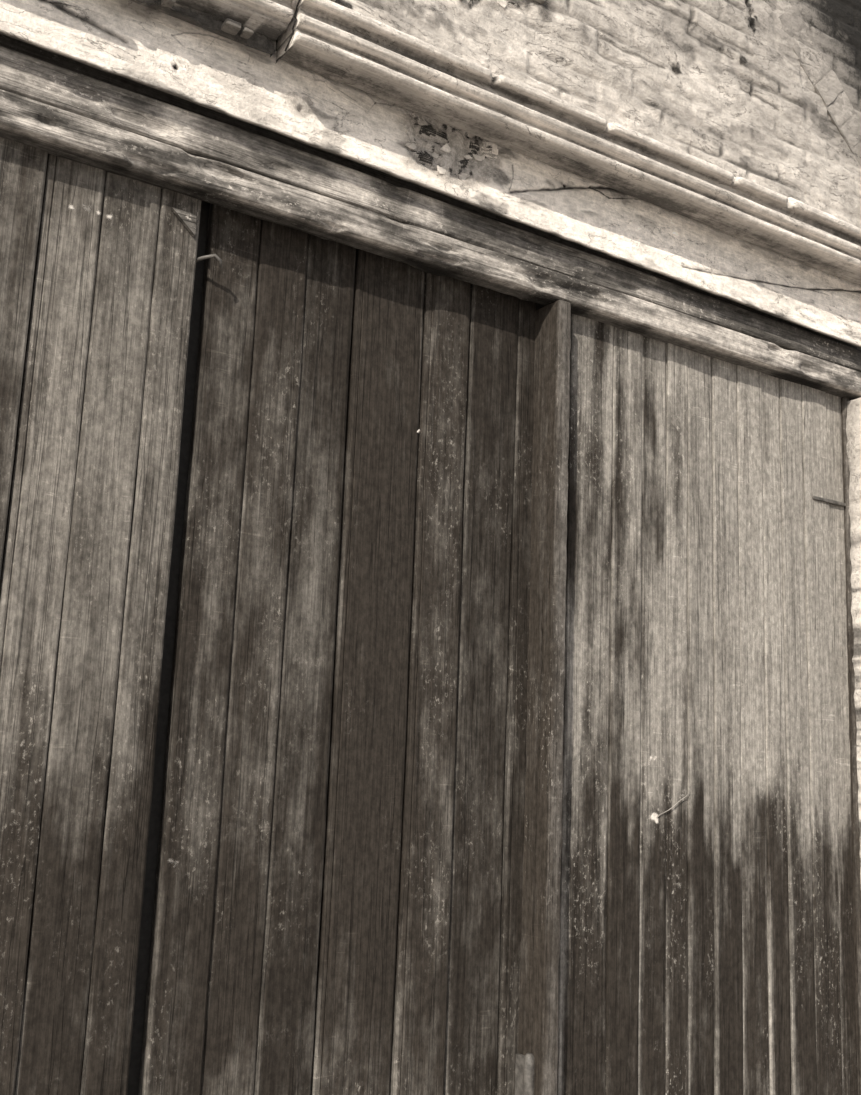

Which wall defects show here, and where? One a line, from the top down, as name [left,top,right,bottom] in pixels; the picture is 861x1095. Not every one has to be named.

crack [41,0,123,41]
crack [284,0,300,52]
flaking render [405,112,500,185]
crack [510,167,638,200]
crack [682,266,861,293]